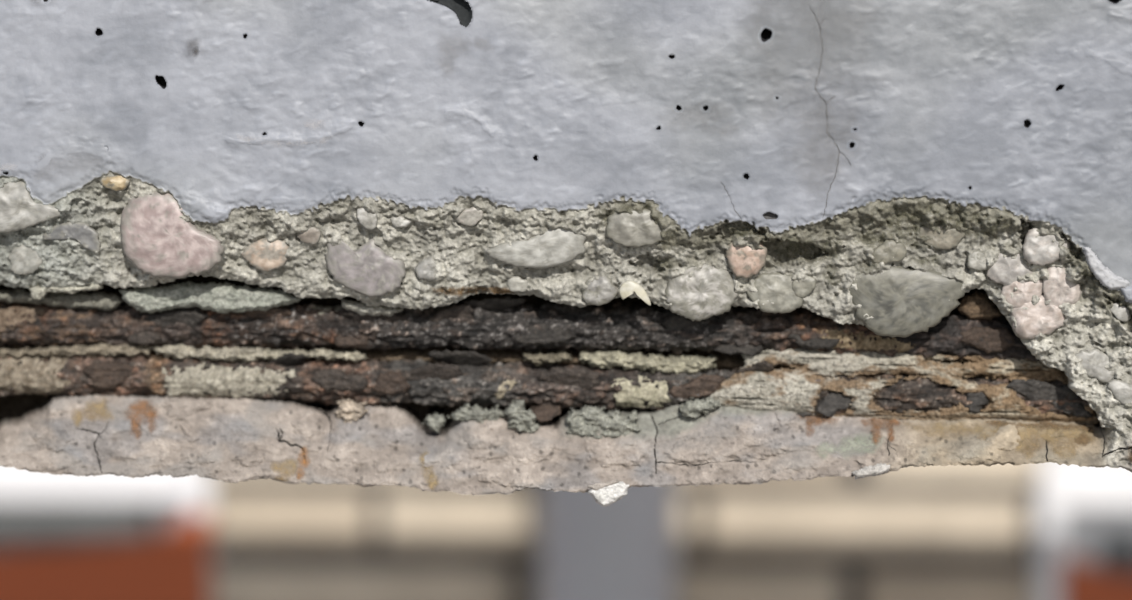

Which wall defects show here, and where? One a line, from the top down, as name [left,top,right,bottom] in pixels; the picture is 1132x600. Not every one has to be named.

crack [810,8,851,216]
spalling [0,171,1132,507]
crack [76,422,109,475]
rust [130,400,155,438]
crack [276,400,331,461]